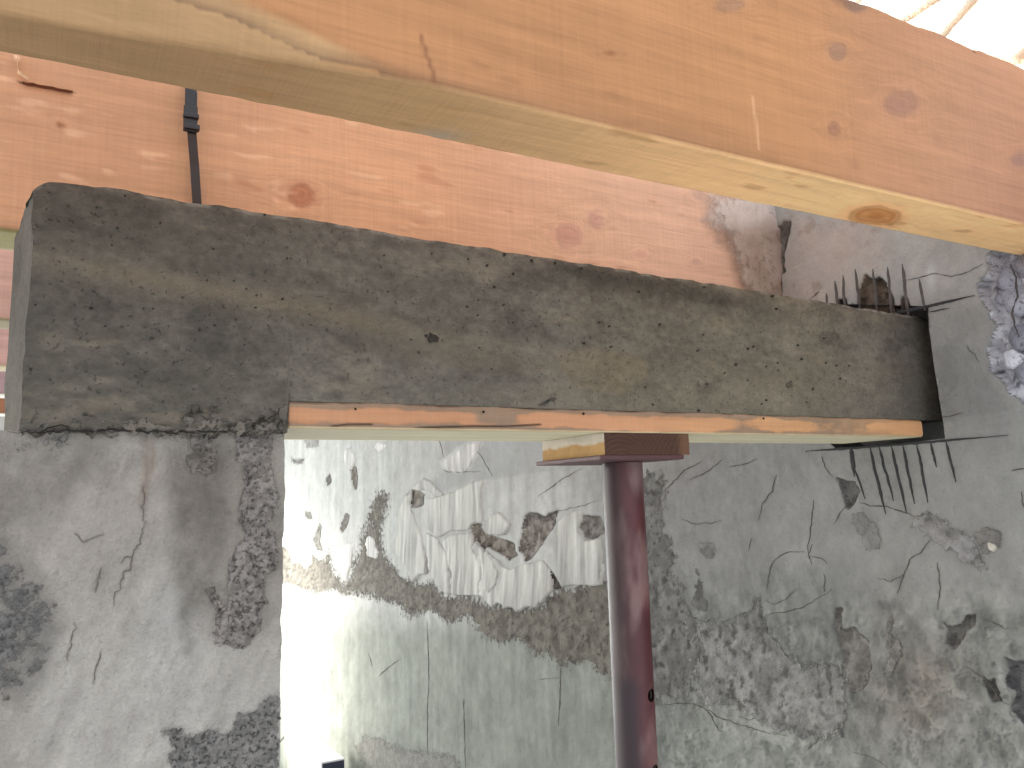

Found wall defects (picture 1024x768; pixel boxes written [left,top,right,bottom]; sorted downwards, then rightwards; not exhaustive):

spalling [778,221,791,274]
spalling [860,275,914,322]
spalling [977,250,1024,403]
crack [7,405,284,434]
crack [662,458,757,492]
crack [95,488,146,599]
peeling [282,440,612,681]
spalling [643,469,871,740]
crack [722,500,914,622]
spalling [837,478,882,552]
crack [884,541,941,610]
crack [667,702,819,750]